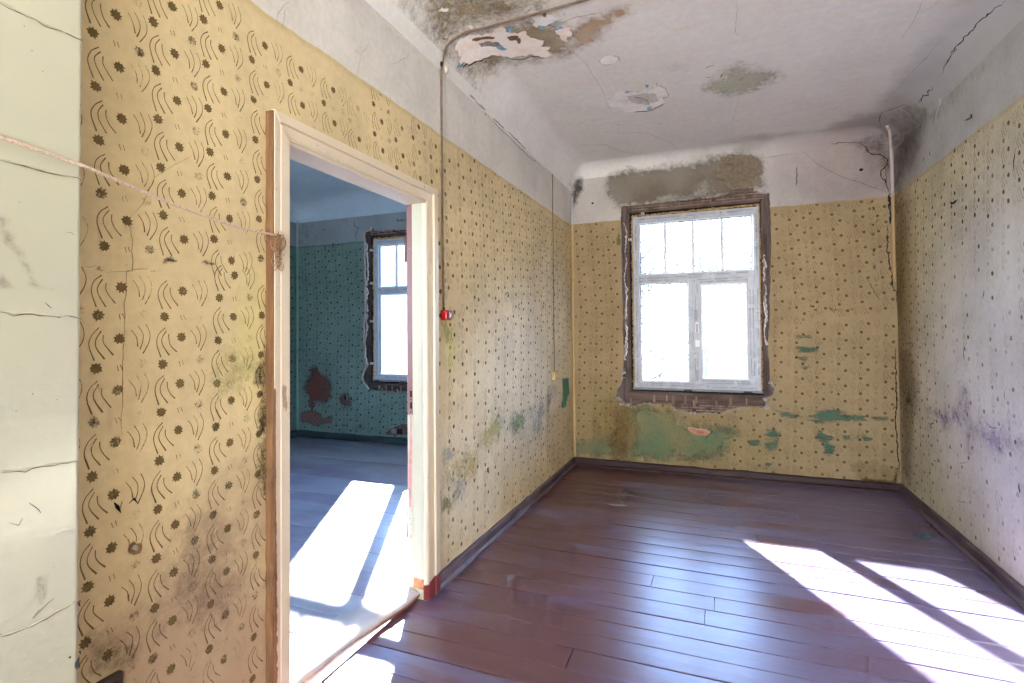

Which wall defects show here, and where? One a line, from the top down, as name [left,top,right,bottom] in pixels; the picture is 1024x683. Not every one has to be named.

crack [0,2,82,41]
damp [428,0,522,57]
damp [470,55,515,73]
peeling [454,13,572,68]
damp [506,21,568,56]
crack [879,1,1005,124]
peeling [606,83,669,112]
spalling [631,154,770,206]
crack [1,310,80,319]
peeling [615,223,888,454]
peeling [301,367,351,426]
crack [2,459,79,473]